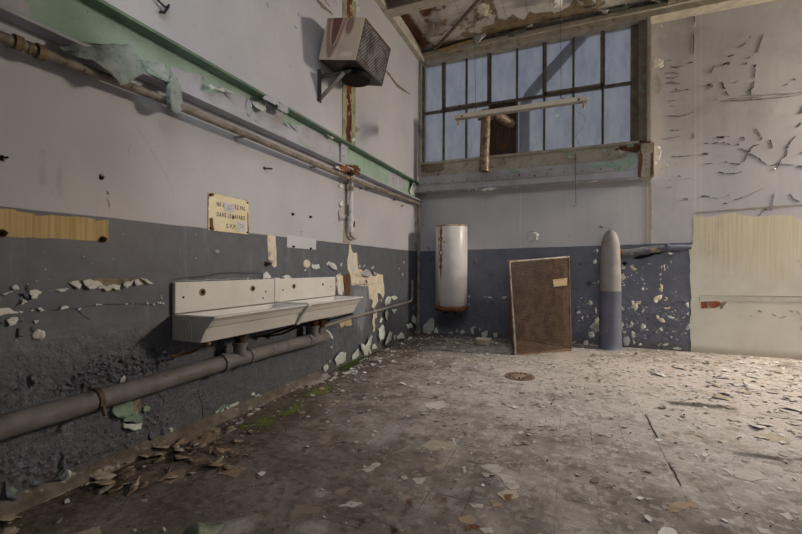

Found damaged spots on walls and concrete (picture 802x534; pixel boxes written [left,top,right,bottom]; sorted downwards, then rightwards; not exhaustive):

peeling [424,0,629,52]
peeling [58,42,349,161]
crack [665,16,696,181]
peeling [546,144,638,183]
peeling [0,280,134,342]
peeling [57,277,153,292]
peeling [263,235,277,279]
peeling [287,235,316,250]
flaking render [303,183,498,387]
peeling [621,189,802,360]